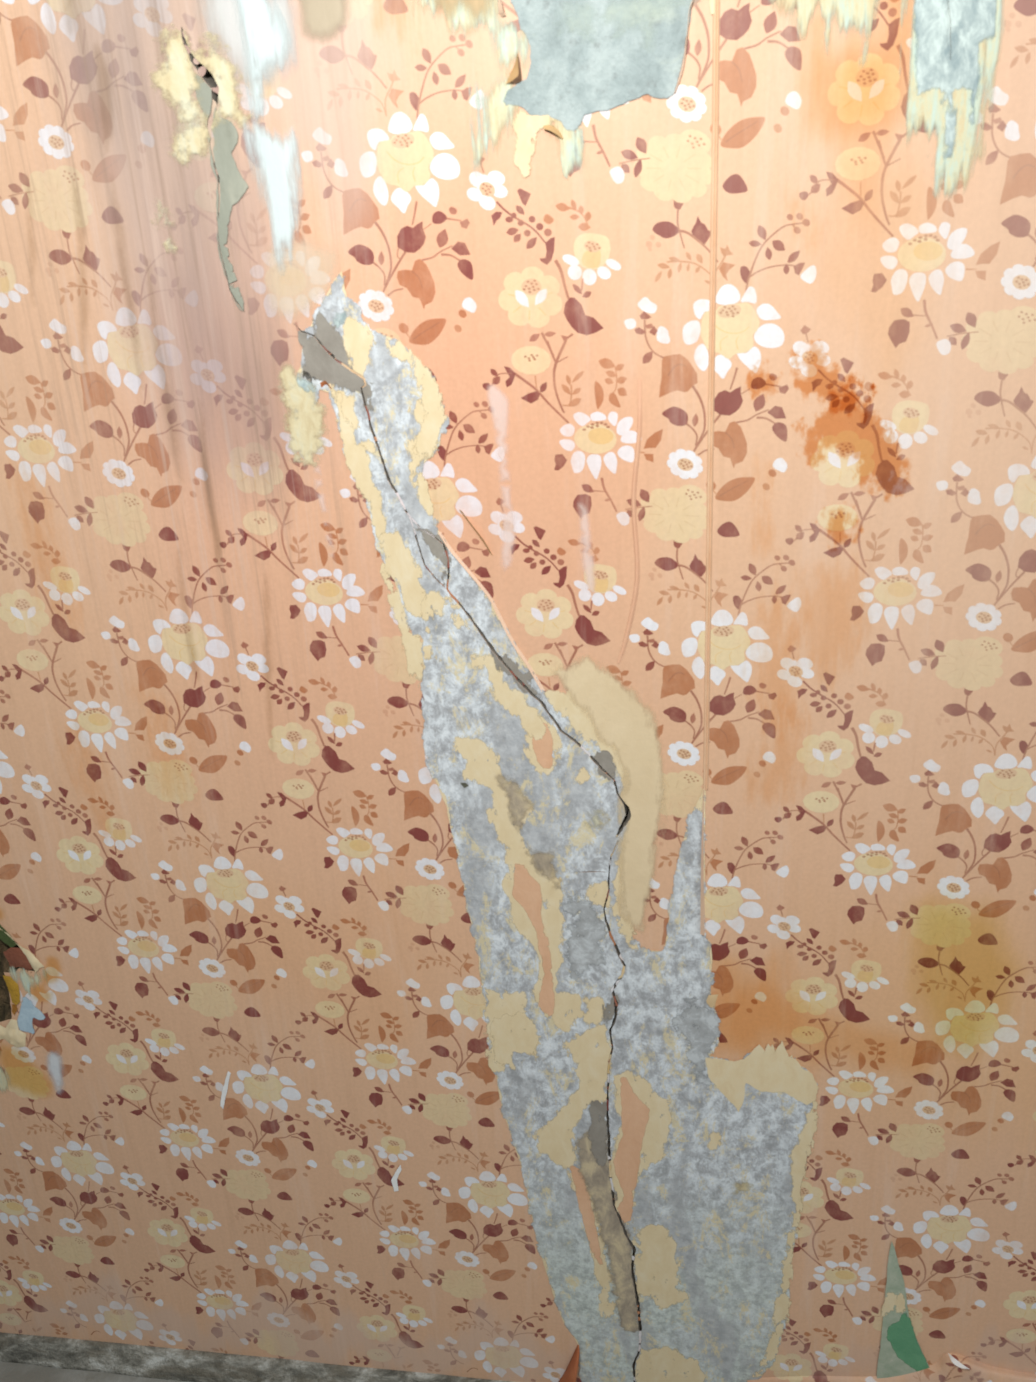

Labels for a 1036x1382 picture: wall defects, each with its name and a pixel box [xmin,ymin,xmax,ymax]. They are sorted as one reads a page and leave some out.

peeling [151,0,344,311]
peeling [421,0,693,178]
peeling [772,0,877,61]
peeling [901,0,1002,195]
crack [294,324,642,1382]
peeling [296,271,819,1382]
spalling [0,925,47,1048]
spalling [48,1053,62,1091]
peeling [877,1242,929,1378]